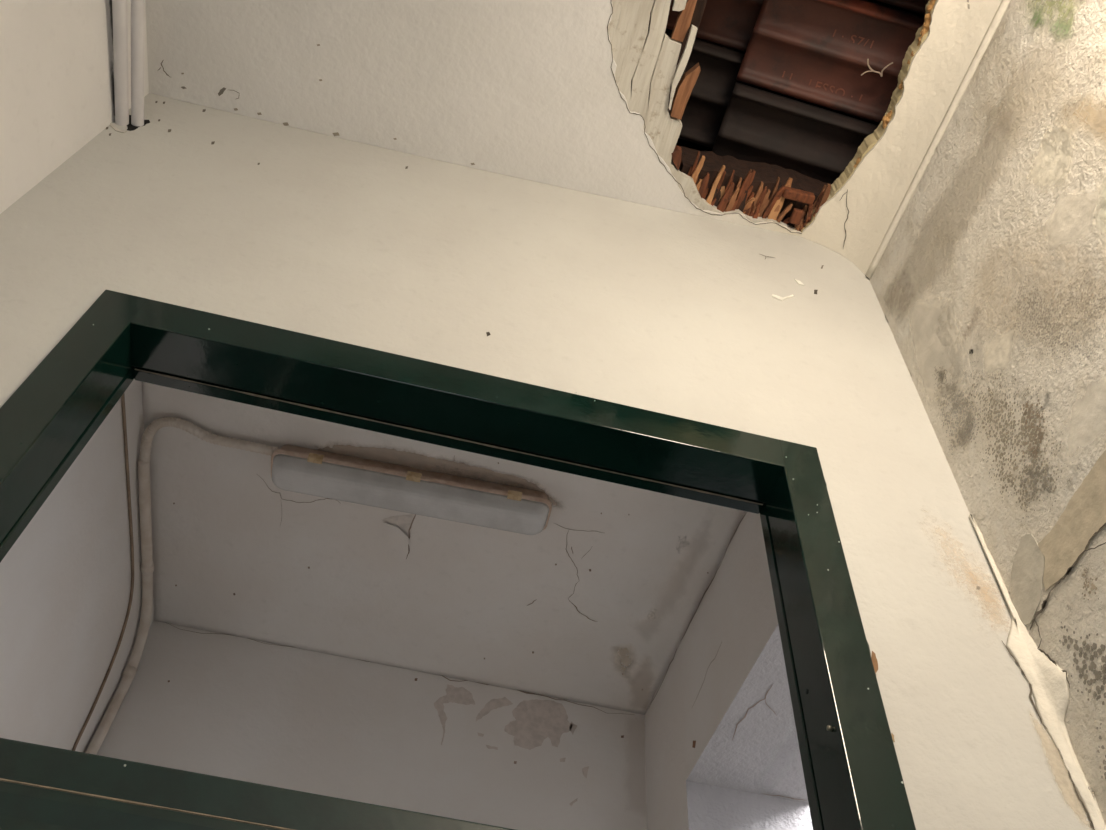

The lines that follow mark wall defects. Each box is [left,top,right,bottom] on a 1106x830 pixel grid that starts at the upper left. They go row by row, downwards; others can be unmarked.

spalling [826,0,937,202]
leakage [910,301,1071,518]
peeling [434,684,577,762]
crack [1002,523,1106,830]
leakage [1059,622,1106,710]